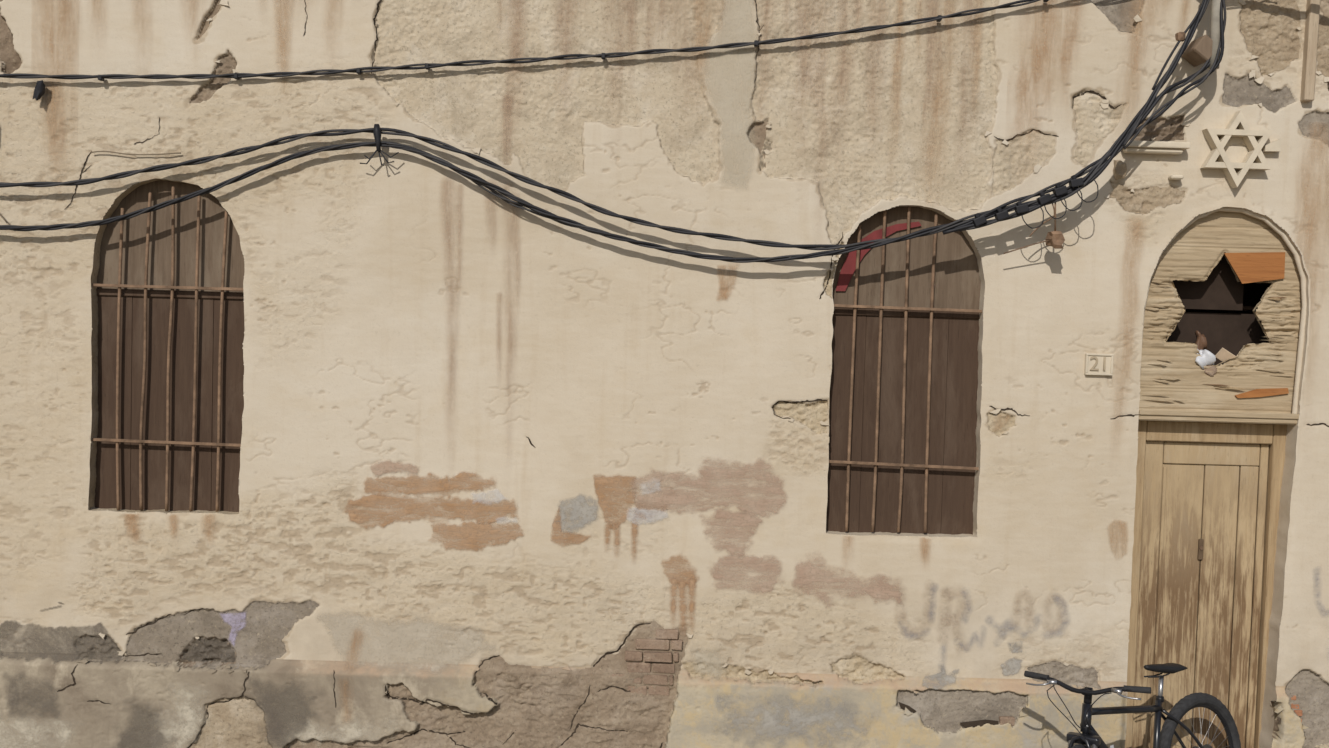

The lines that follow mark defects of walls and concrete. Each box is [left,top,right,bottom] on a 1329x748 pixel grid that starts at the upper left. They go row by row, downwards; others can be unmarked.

spalling [0,0,22,74]
spalling [189,50,239,103]
crack [371,0,382,74]
peeling [371,0,722,189]
crack [754,0,764,88]
spalling [1090,0,1144,33]
peeling [1222,0,1302,113]
peeling [748,0,1056,298]
peeling [345,461,523,551]
spalling [0,600,319,674]
spalling [189,556,1029,748]
spalling [1274,670,1329,748]